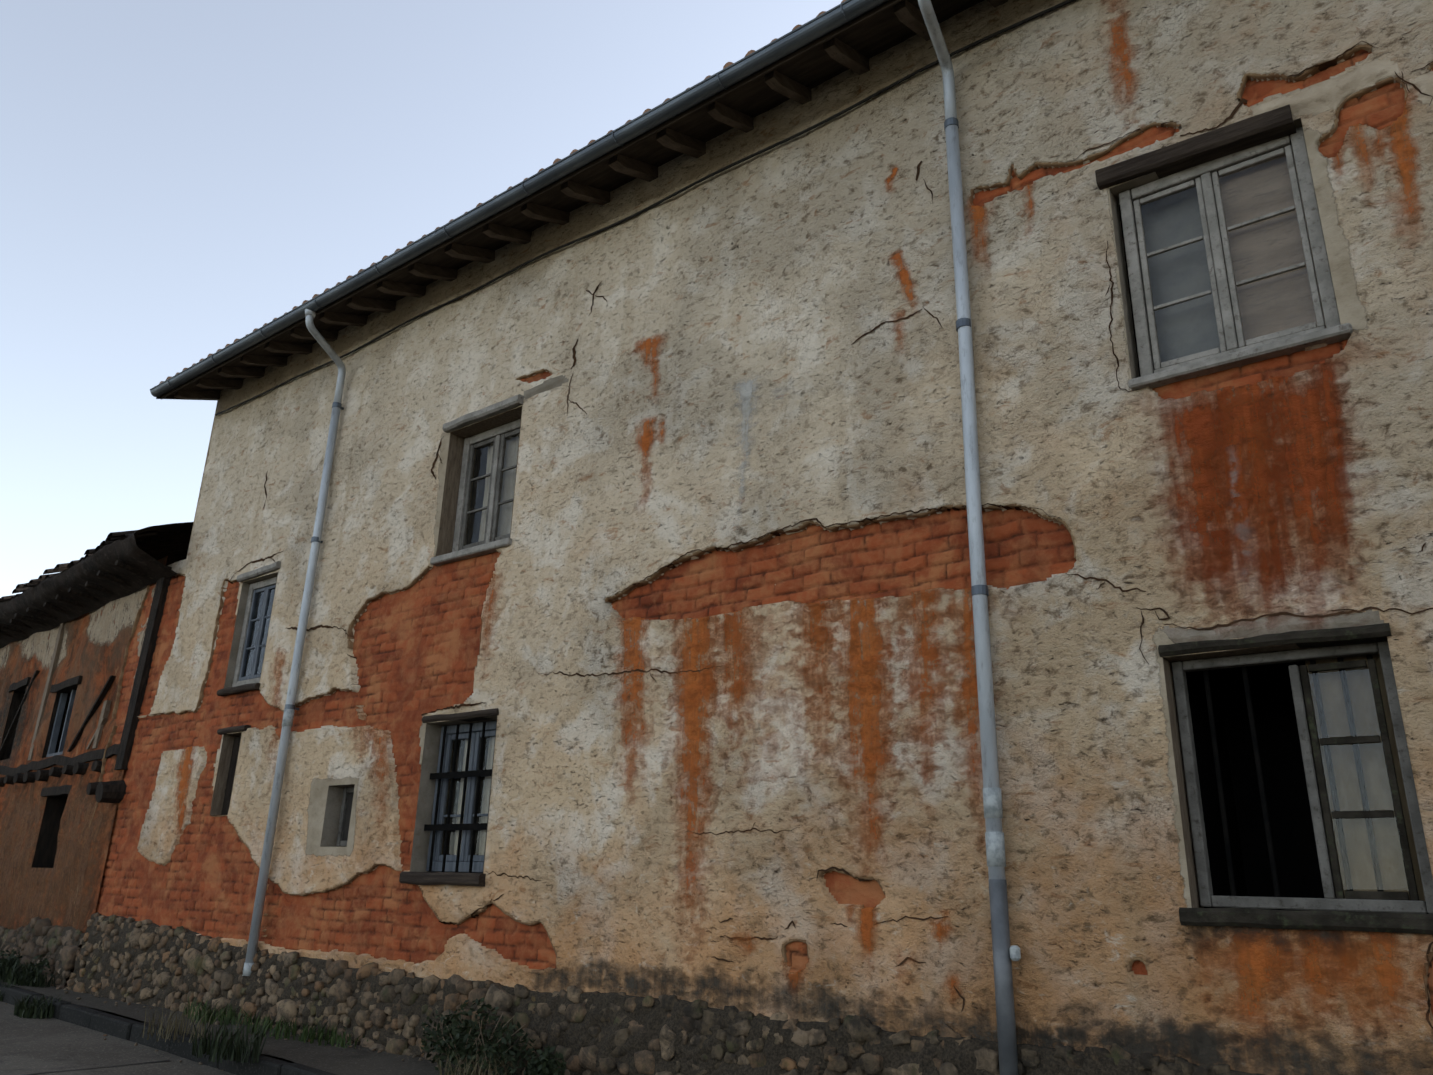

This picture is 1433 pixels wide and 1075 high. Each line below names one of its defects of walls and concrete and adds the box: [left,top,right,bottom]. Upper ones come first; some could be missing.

peeling [969,122,1181,207]
peeling [1236,44,1373,107]
peeling [1318,77,1408,158]
crack [851,307,942,345]
rust [1166,360,1351,598]
peeling [87,552,557,970]
crack [541,666,722,682]
rust [676,607,748,902]
peeling [605,503,1077,620]
rust [803,591,891,851]
rust [910,588,981,784]
crack [1065,573,1433,664]